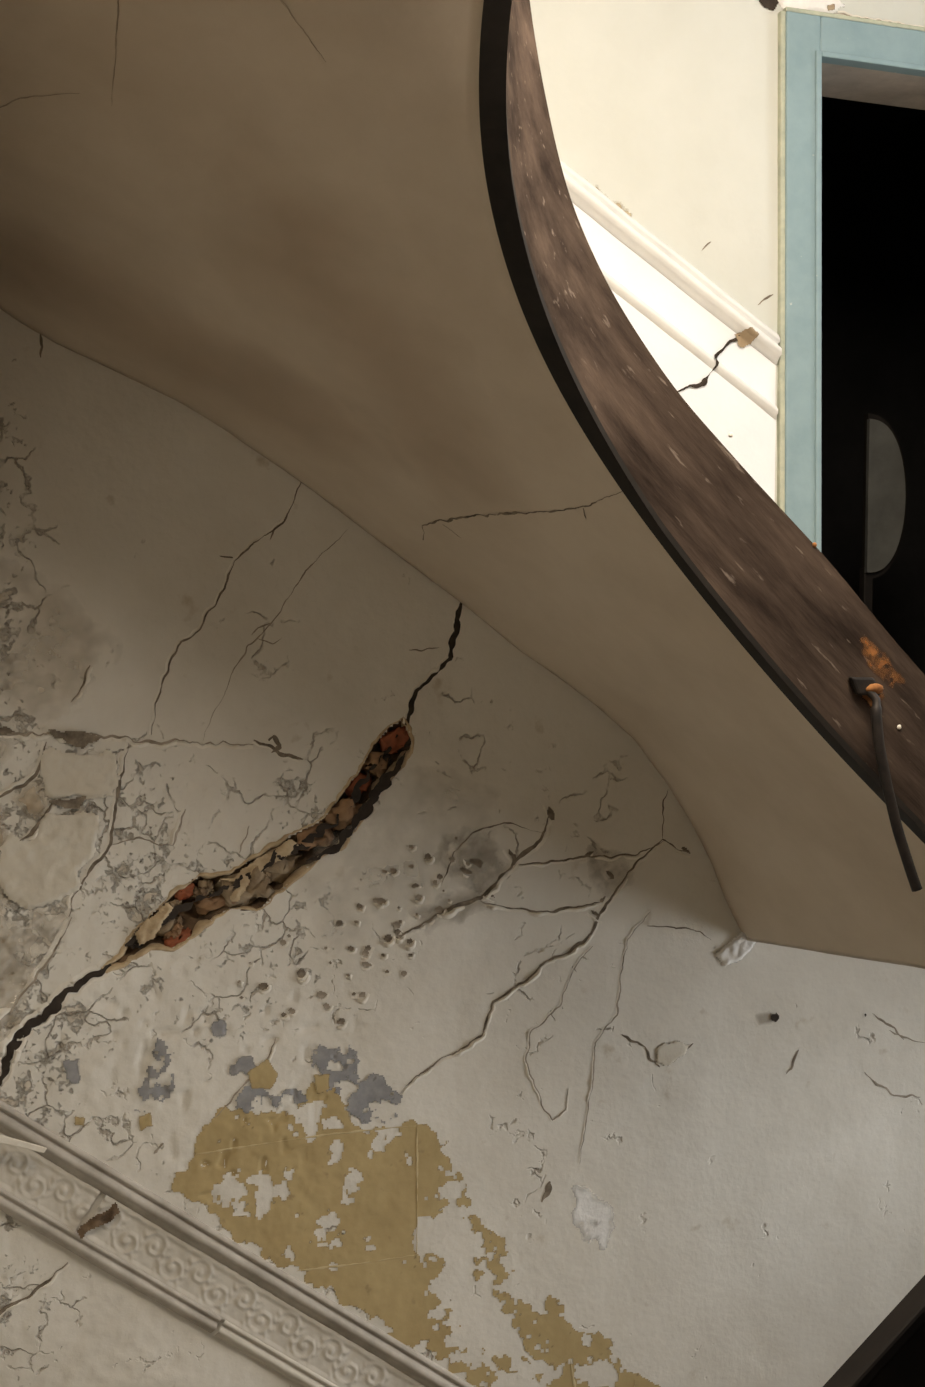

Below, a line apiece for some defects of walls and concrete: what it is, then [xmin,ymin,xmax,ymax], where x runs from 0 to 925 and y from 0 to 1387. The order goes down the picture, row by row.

crack [678,335,740,392]
rust [863,639,900,681]
peeling [0,729,120,910]
crack [0,482,462,1090]
spalling [324,837,495,1004]
crack [396,791,708,1202]
peeling [63,1059,80,1084]
peeling [135,1038,175,1131]
crack [215,1037,279,1118]
peeling [622,1034,693,1067]
peeling [171,962,661,1387]